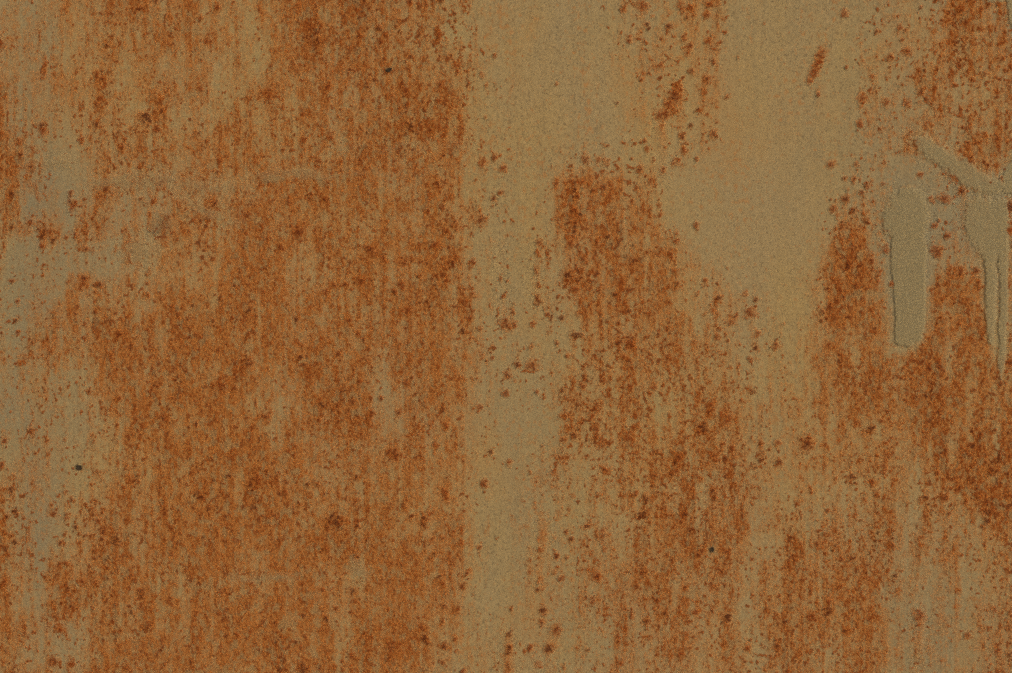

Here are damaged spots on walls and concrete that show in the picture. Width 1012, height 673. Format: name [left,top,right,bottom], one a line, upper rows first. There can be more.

corrosion [618,0,729,165]
corrosion [807,46,830,96]
corrosion [855,0,1012,180]
corrosion [0,0,551,673]
corrosion [477,596,570,673]